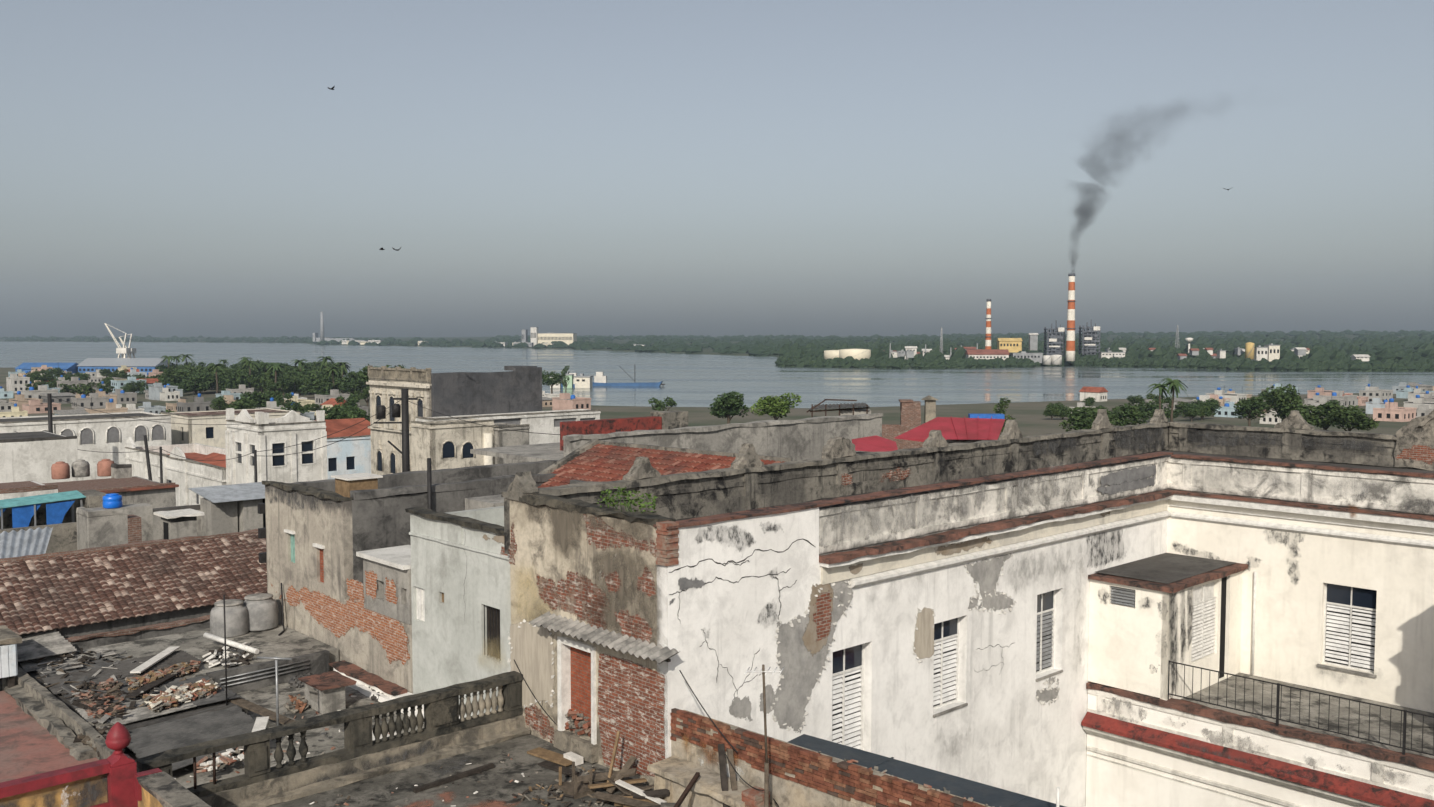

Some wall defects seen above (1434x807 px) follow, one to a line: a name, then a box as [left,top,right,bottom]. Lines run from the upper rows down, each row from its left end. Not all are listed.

flaking render [1395,445,1434,465]
flaking render [271,570,410,665]
peeling [507,619,555,743]
flaking render [535,513,705,644]
flaking render [598,654,665,777]
crack [669,539,815,701]
peeling [758,563,863,733]
peeling [912,607,936,663]
peeling [934,536,1016,614]